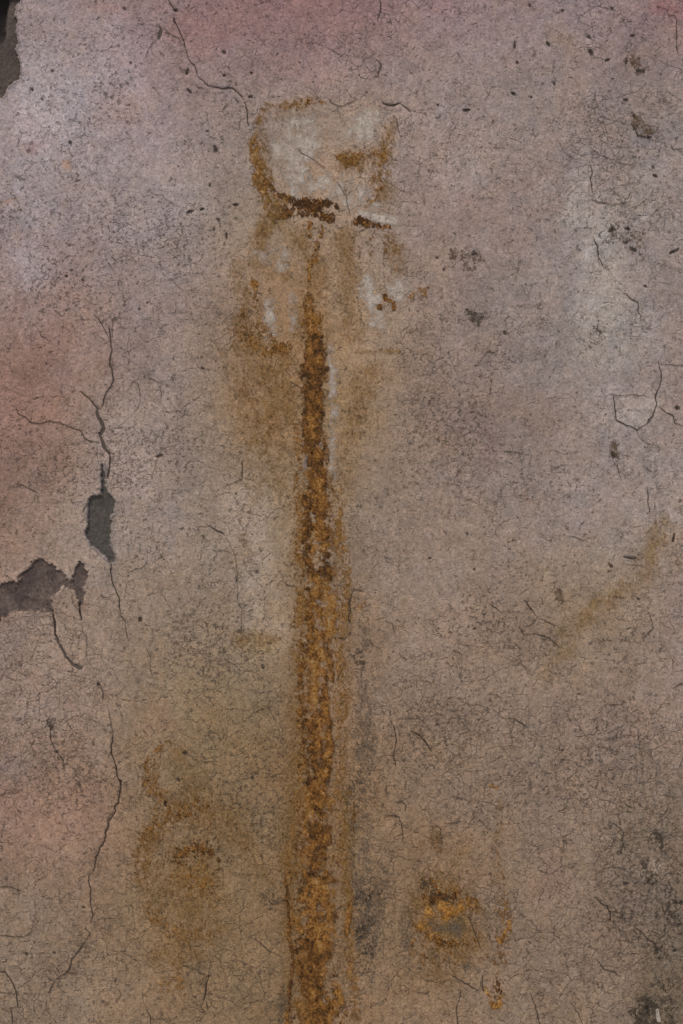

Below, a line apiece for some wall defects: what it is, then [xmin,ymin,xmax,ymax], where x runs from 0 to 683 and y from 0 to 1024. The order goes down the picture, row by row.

spalling [0,0,21,98]
crack [138,1,248,124]
rust [335,126,391,259]
rust [377,293,396,311]
crack [16,311,164,477]
crack [610,361,683,513]
spalling [0,558,88,622]
spalling [85,465,115,563]
rust [238,97,366,1024]
crack [0,596,121,1024]
rust [401,876,481,967]
rust [484,870,512,1009]